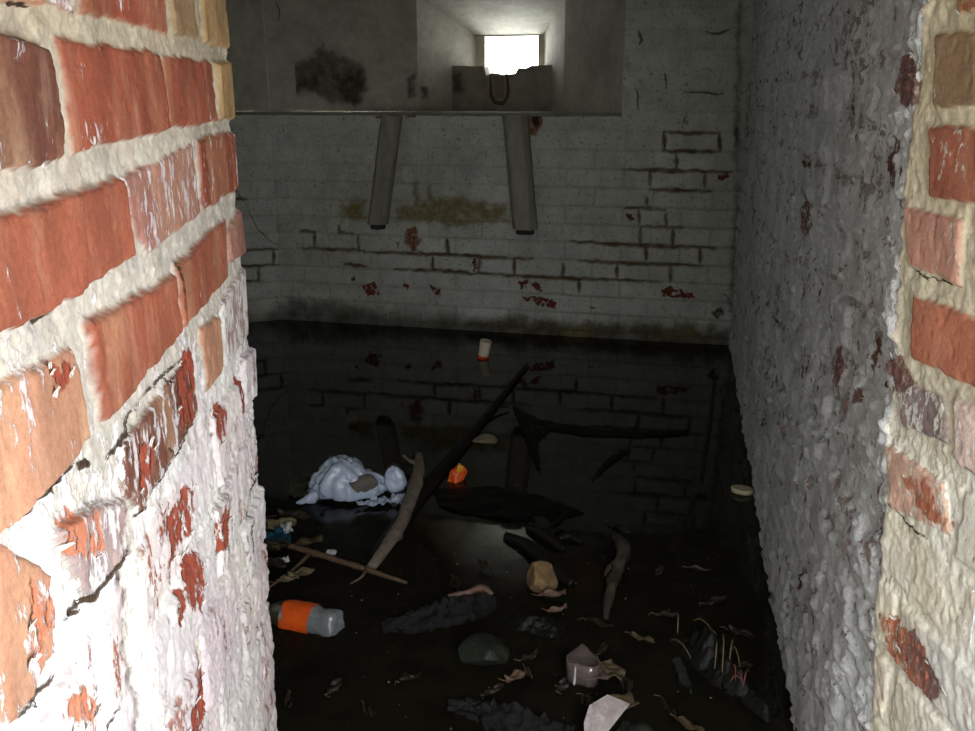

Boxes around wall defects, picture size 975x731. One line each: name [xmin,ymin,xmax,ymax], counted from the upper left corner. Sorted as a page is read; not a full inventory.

water stain [295,49,365,103]
water stain [398,183,505,226]
water stain [468,318,726,345]
crack [107,362,179,461]
peeling [175,347,228,448]
peeling [139,435,159,494]
crack [133,424,193,518]
peeling [52,505,105,560]
crack [65,549,128,621]
peeling [167,484,234,628]
peeling [67,685,103,731]
peeling [189,661,207,731]